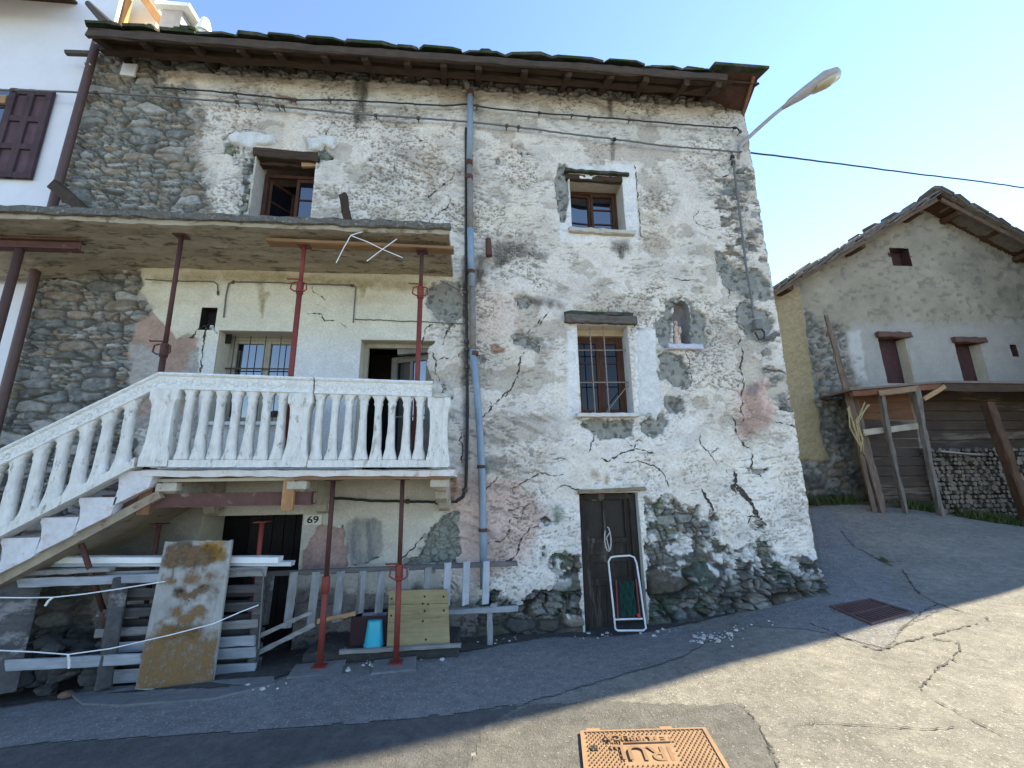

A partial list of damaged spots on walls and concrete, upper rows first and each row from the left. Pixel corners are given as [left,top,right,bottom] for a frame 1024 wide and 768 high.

spalling [223,131,276,215]
crack [189,325,217,372]
spalling [424,281,463,327]
crack [482,313,548,418]
peeling [580,298,711,440]
spalling [716,253,772,343]
crack [699,335,767,539]
spalling [403,511,461,574]
crack [486,437,669,561]
spalling [643,493,831,625]